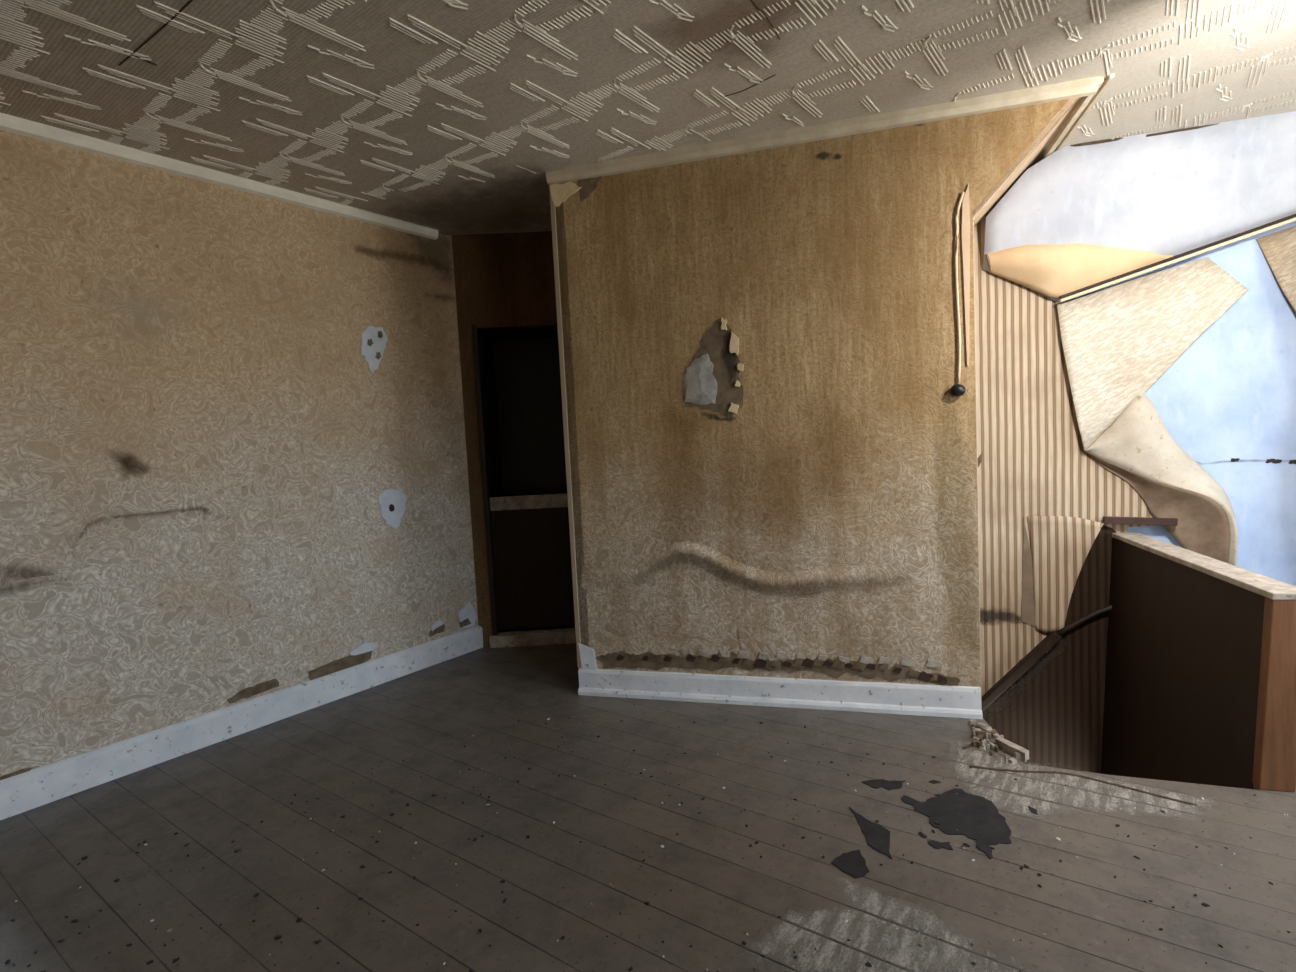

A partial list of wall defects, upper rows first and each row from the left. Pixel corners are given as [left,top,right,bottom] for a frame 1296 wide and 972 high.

flaking render [361,326,388,373]
flaking render [682,317,744,418]